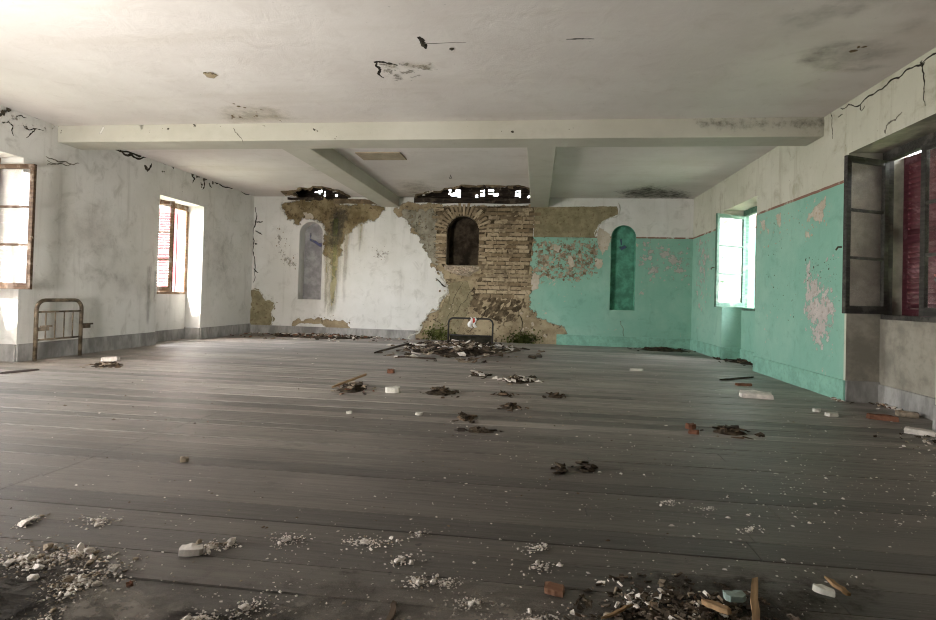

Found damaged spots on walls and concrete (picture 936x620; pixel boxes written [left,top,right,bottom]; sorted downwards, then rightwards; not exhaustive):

peeling [374,61,430,81]
crack [831,53,936,139]
crack [8,115,44,138]
crack [46,156,77,166]
crack [117,150,263,283]
peeling [760,196,830,256]
flaking render [250,288,278,325]
flaking render [393,201,621,344]
peeling [788,254,839,350]